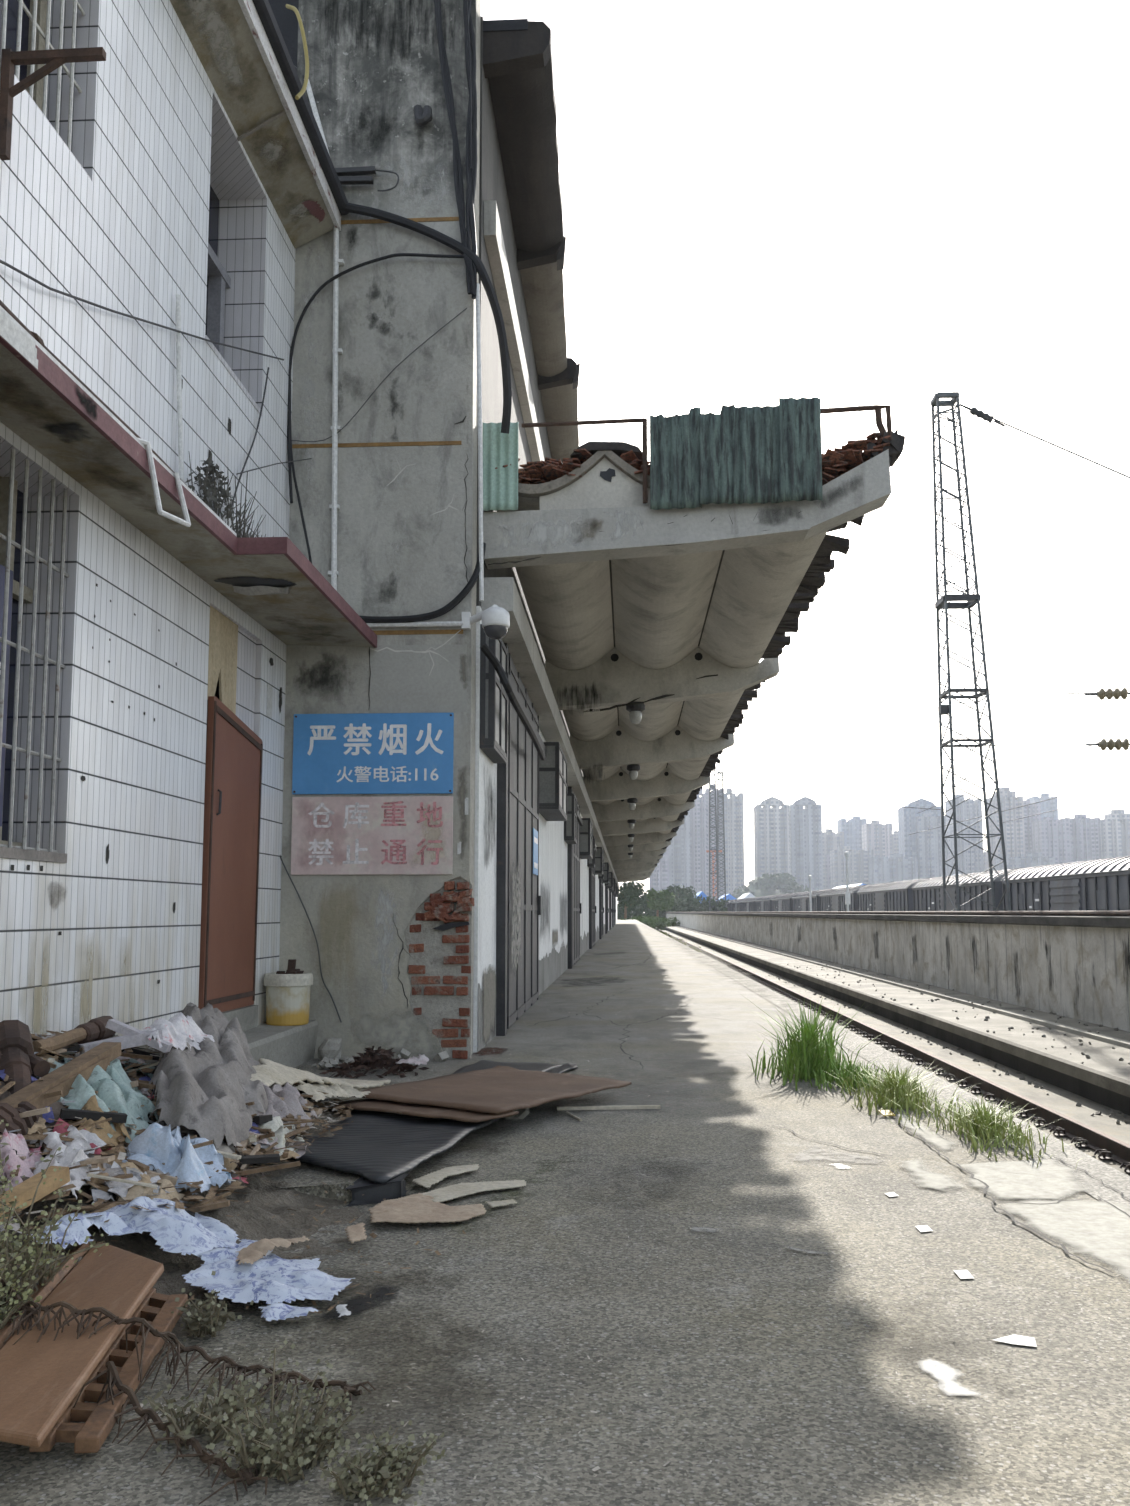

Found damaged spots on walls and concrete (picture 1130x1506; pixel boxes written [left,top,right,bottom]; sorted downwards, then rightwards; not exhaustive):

damp [188,0,247,97]
damp [325,0,446,58]
damp [354,107,390,143]
spalling [356,876,496,1059]
crack [762,1102,1130,1273]